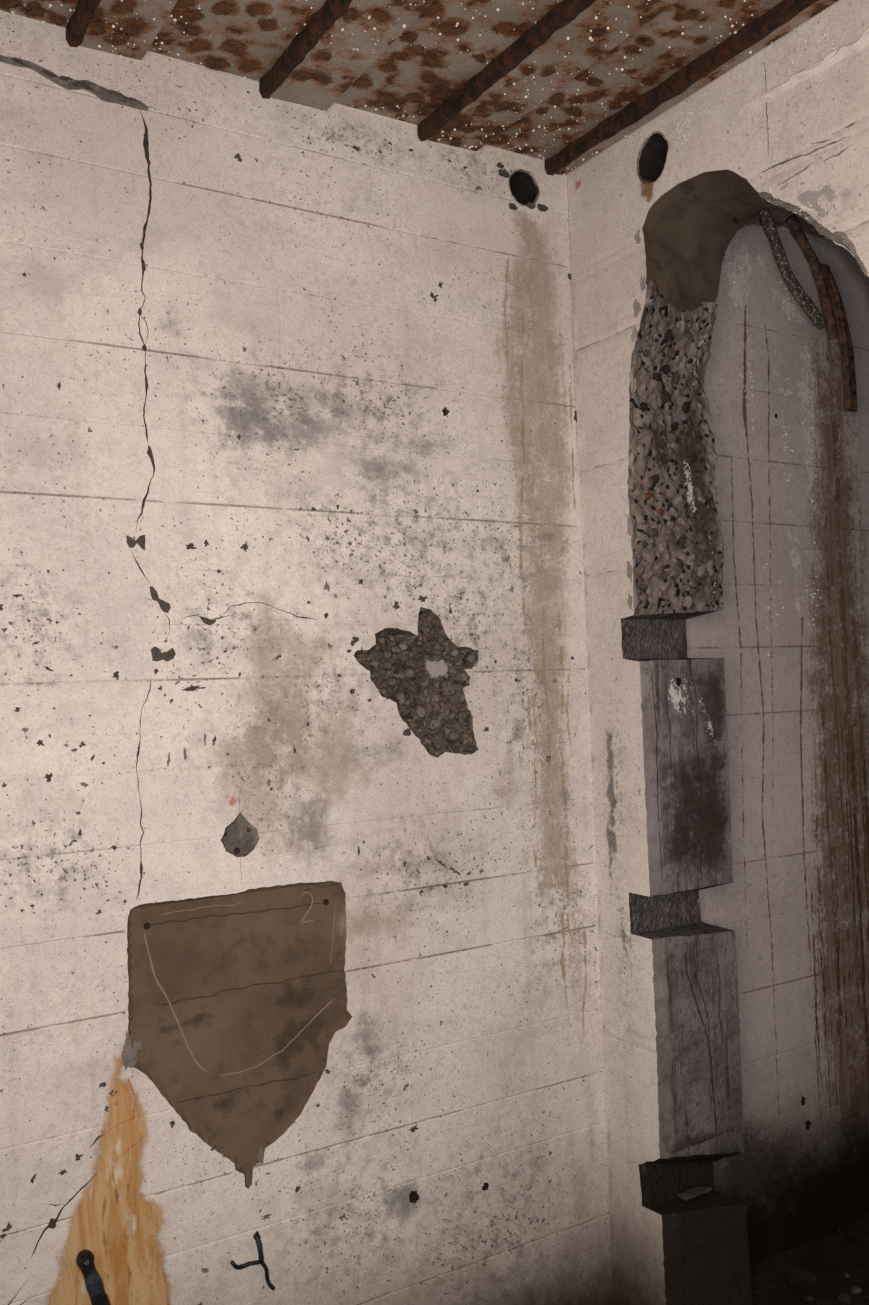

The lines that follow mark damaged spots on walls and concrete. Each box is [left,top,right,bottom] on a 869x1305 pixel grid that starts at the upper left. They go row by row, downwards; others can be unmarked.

rust [0,0,79,25]
rust [187,40,261,73]
rust [175,0,277,31]
rust [536,35,672,117]
spalling [759,139,868,340]
spalling [627,273,724,615]
water stain [775,346,816,495]
peeling [157,685,206,704]
spalling [328,595,497,758]
water stain [504,215,587,1035]
peeling [426,856,484,888]
rust [48,1031,170,1305]